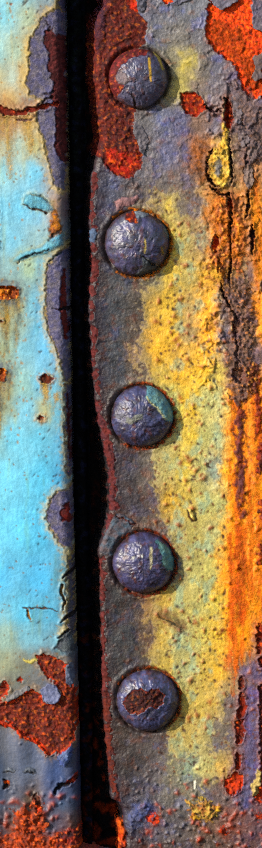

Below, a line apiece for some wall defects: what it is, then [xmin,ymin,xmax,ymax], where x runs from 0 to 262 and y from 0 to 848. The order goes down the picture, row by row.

peeling [25,0,69,190]
peeling [85,0,149,179]
peeling [180,92,206,117]
peeling [205,0,262,99]
crack [210,144,256,311]
corrosion [87,171,120,535]
peeling [0,245,80,755]
corrosion [225,351,262,676]
corrosion [98,556,183,801]
corrosion [0,798,83,848]
corrosion [114,814,126,848]